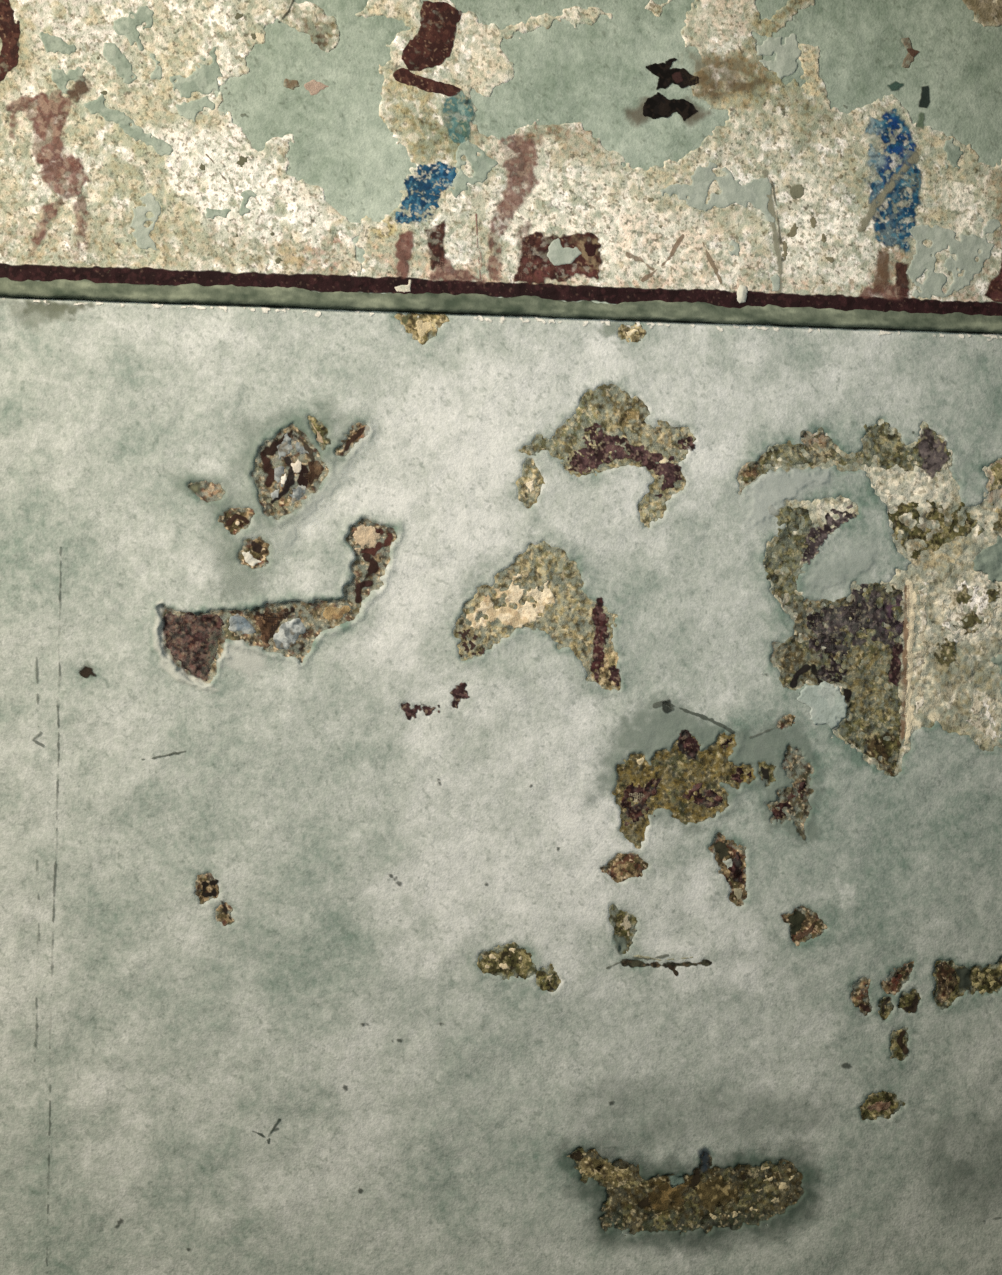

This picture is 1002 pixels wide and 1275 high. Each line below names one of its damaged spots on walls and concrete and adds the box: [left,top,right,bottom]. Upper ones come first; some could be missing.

peeling [0,0,1002,303]
spalling [187,416,370,569]
spalling [516,384,696,528]
spalling [154,519,397,690]
spalling [453,541,621,691]
peeling [904,580,1001,745]
spalling [477,942,561,992]
spalling [600,729,814,883]
spalling [708,832,747,906]
spalling [781,906,828,946]
spalling [850,957,1002,1061]
spalling [567,1147,804,1236]